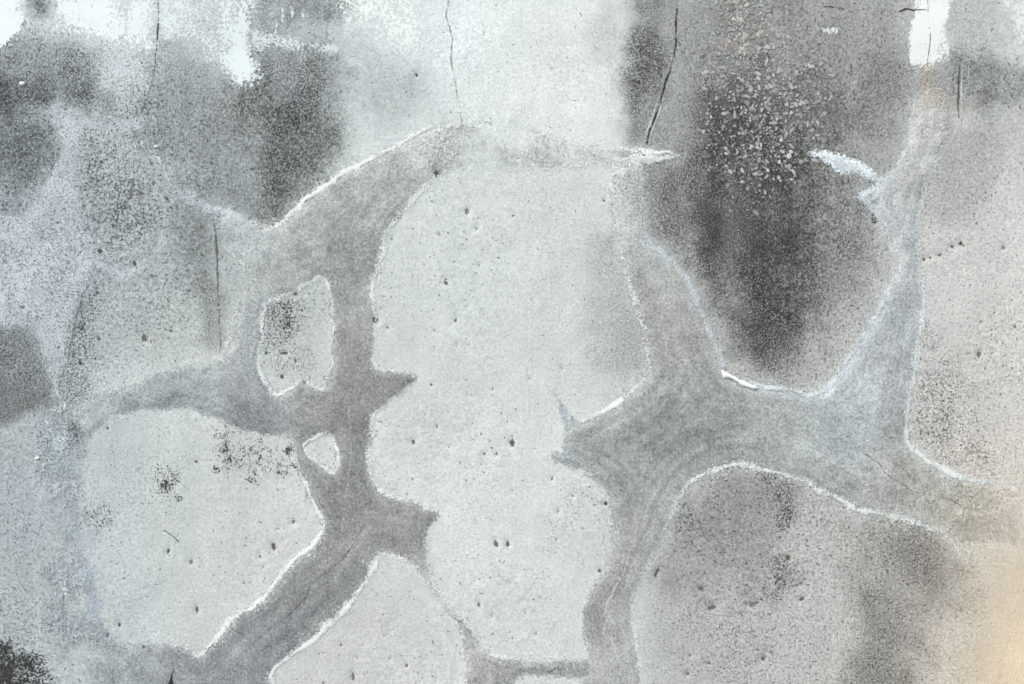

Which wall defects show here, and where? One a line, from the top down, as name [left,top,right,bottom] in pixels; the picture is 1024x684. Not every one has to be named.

damp [257,66,328,196]
damp [263,0,332,34]
crack [441,1,475,143]
damp [629,26,664,141]
crack [628,5,678,162]
damp [692,79,814,359]
damp [0,26,227,684]
crack [211,208,232,466]
damp [262,298,321,382]
damp [660,467,809,680]
damp [945,549,1024,684]